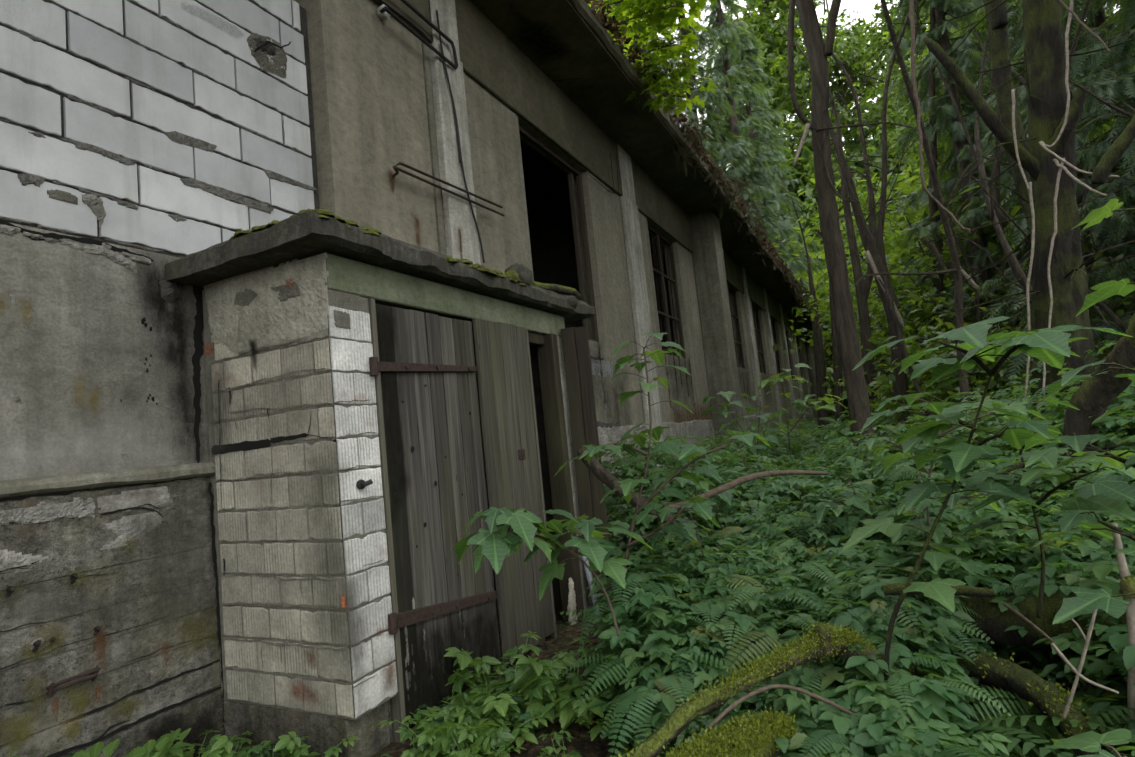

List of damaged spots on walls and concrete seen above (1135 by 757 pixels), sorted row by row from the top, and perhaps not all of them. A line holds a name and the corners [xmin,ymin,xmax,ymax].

spalling [247,32,291,78]
spalling [47,189,106,229]
spalling [0,224,151,273]
peeling [0,486,173,550]
crack [0,286,383,757]
peeling [0,549,48,573]